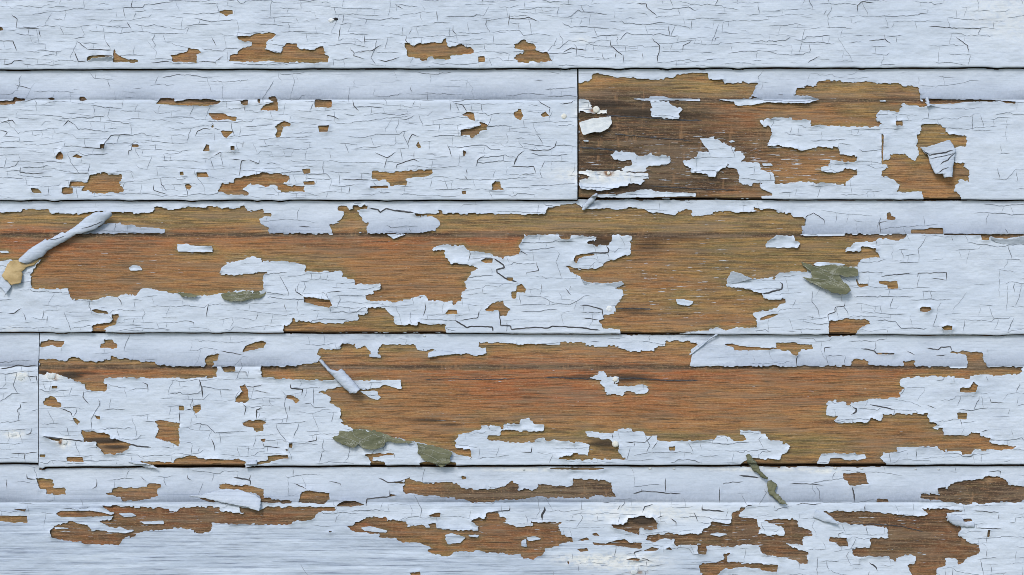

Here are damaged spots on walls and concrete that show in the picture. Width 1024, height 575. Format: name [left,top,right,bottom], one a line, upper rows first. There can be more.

peeling [229,32,329,63]
peeling [404,39,485,62]
crack [0,0,1024,366]
peeling [0,73,1024,505]
crack [0,234,650,527]
crack [547,377,697,391]
crack [830,377,1024,473]
peeling [50,483,364,545]
peeling [347,505,812,575]
crack [451,423,930,575]
peeling [813,476,1024,575]
crack [945,505,1023,575]